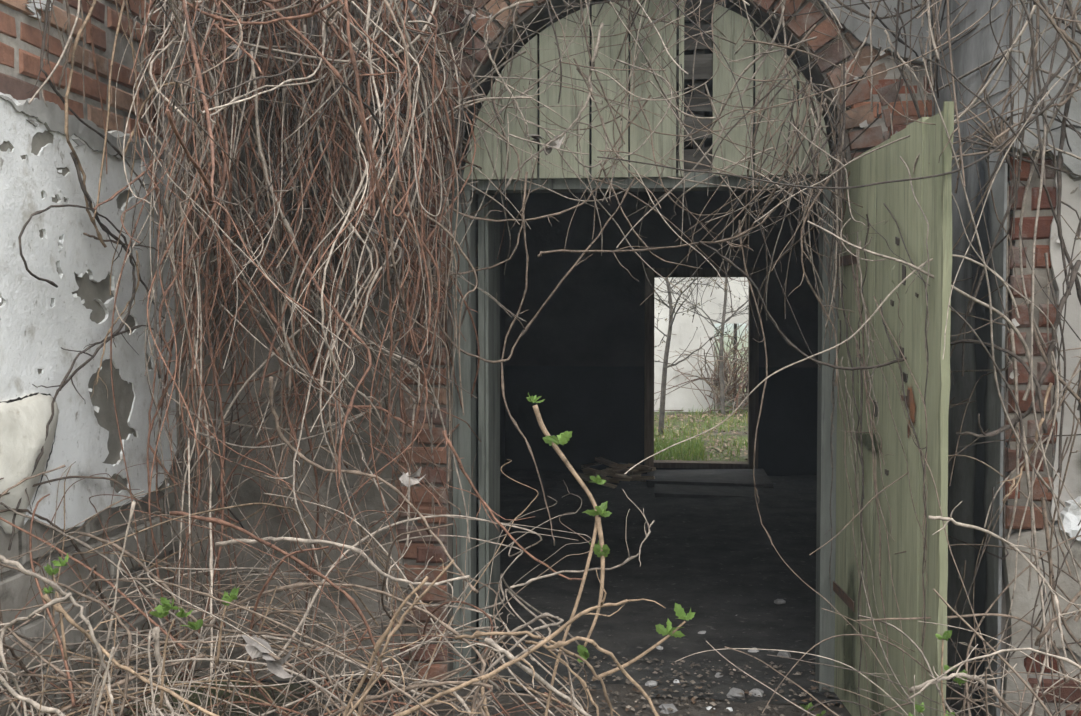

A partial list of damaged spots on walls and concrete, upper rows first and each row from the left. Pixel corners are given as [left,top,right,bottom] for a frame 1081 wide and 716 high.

peeling [72,271,114,324]
peeling [87,359,137,493]